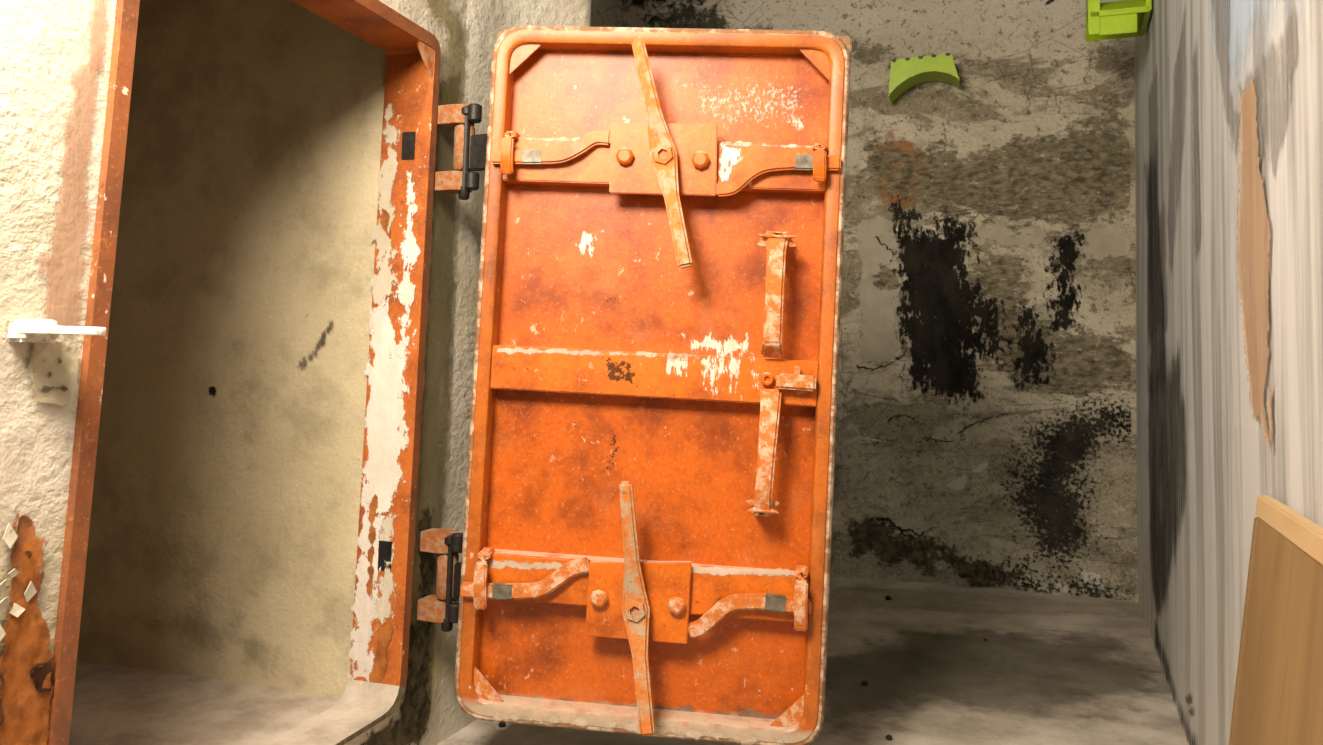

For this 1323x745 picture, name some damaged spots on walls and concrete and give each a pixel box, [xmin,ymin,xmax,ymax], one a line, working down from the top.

leakage [622,0,727,29]
leakage [851,38,895,65]
leakage [1061,94,1130,192]
leakage [1086,40,1126,84]
peeling [347,103,421,682]
leakage [888,195,1088,407]
leakage [960,393,1134,600]
leakage [1144,154,1195,745]
rust [0,514,55,745]